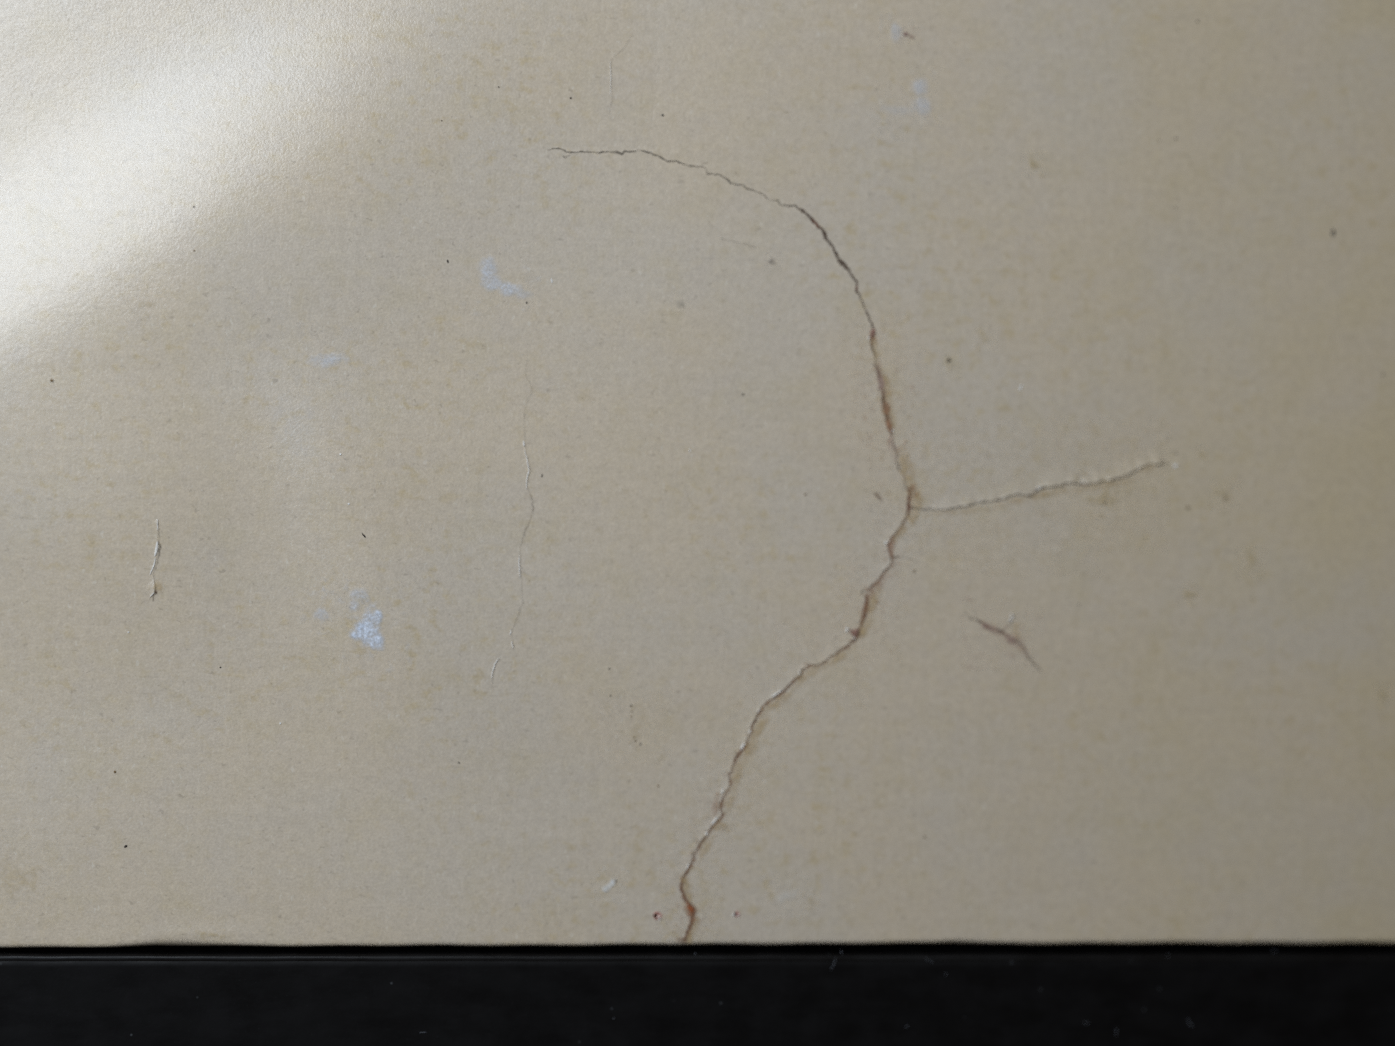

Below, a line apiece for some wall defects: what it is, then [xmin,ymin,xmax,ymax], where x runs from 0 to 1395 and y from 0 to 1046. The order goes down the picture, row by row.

crack [552,145,1166,940]